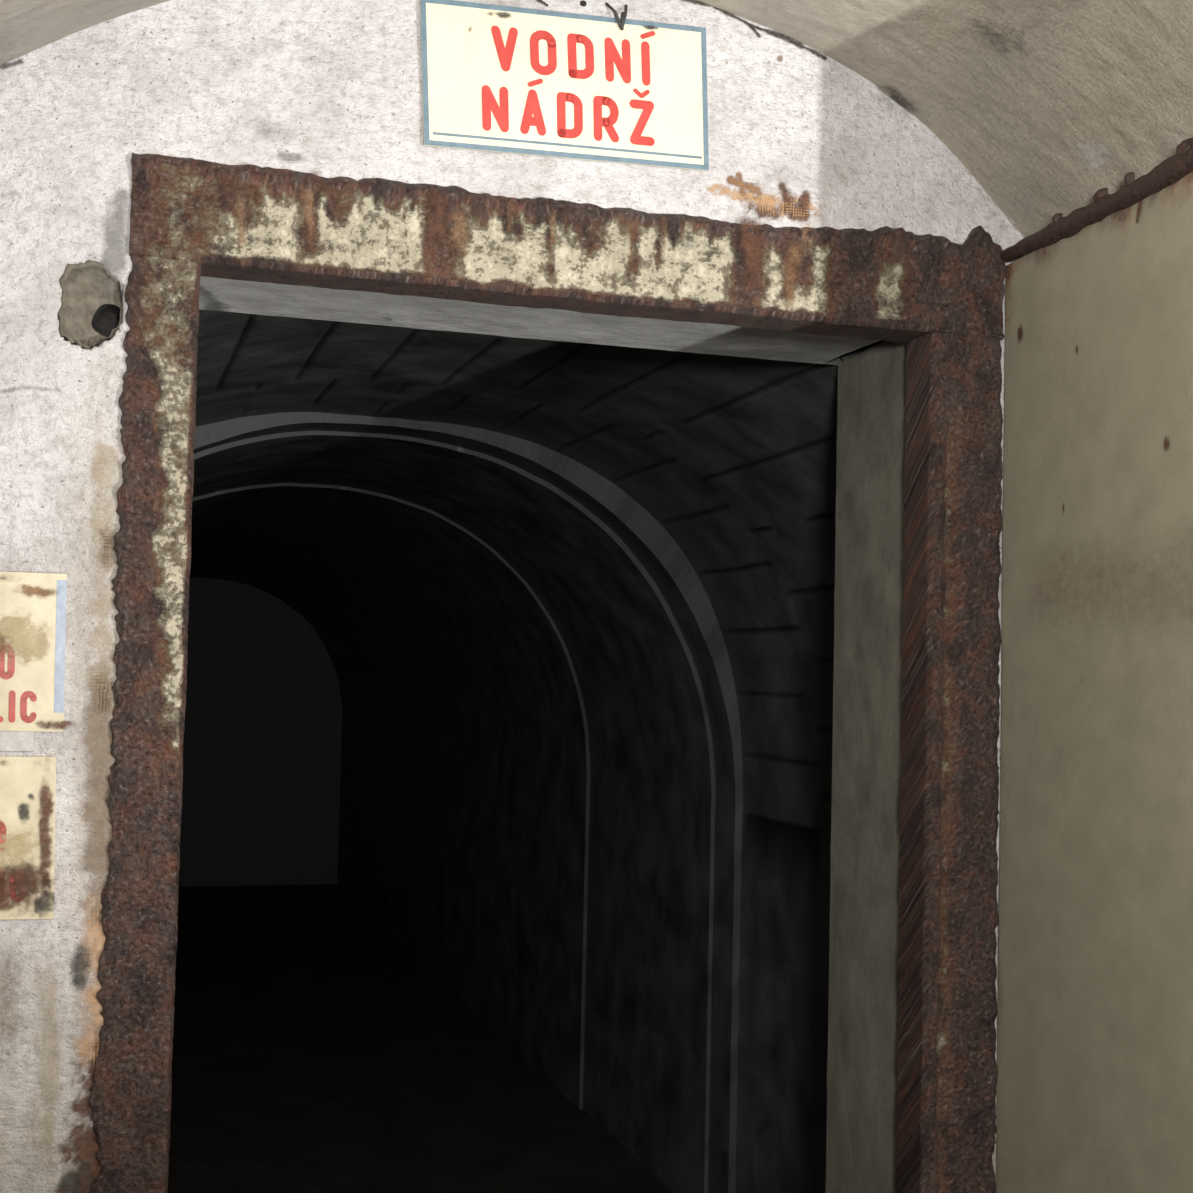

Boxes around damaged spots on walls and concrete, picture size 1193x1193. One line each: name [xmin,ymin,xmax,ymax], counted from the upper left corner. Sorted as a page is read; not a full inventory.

corrosion [708,172,815,277]
corrosion [1000,137,1193,262]
flaking render [57,260,123,349]
corrosion [58,665,116,1193]